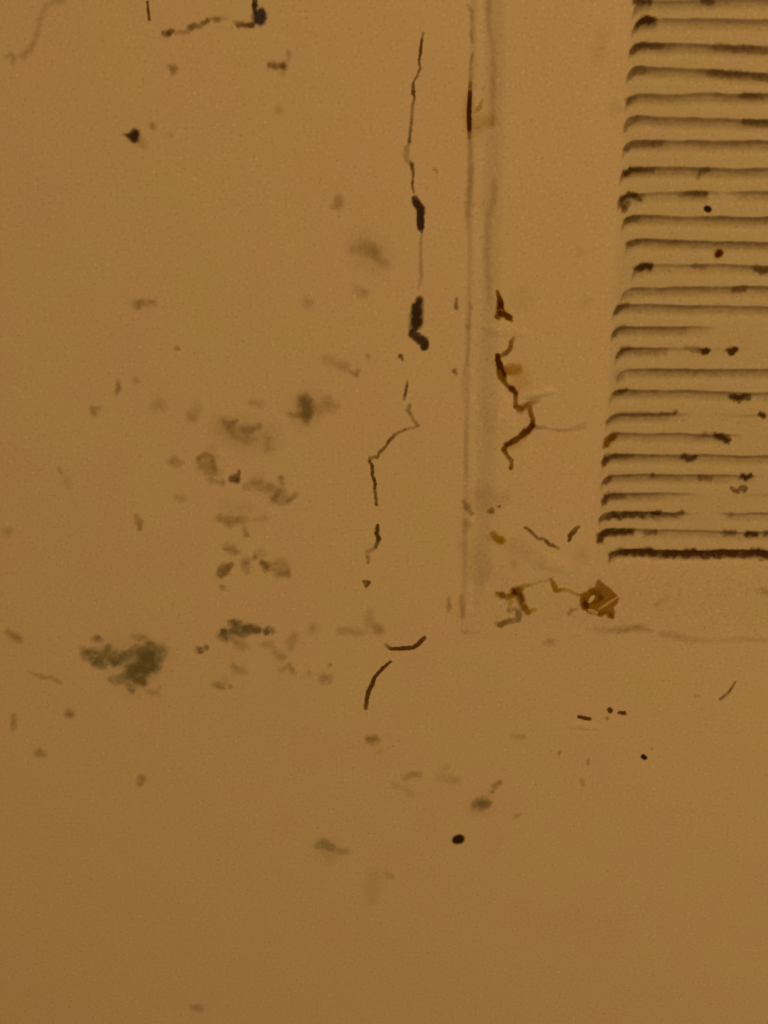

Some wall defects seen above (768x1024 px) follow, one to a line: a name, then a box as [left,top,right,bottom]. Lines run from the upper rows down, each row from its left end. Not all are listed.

crack [408,38,423,189]
crack [495,340,536,470]
crack [369,384,418,548]
mould [85,643,156,685]
mould [220,620,270,640]
crack [364,636,426,710]
rust [580,580,619,619]